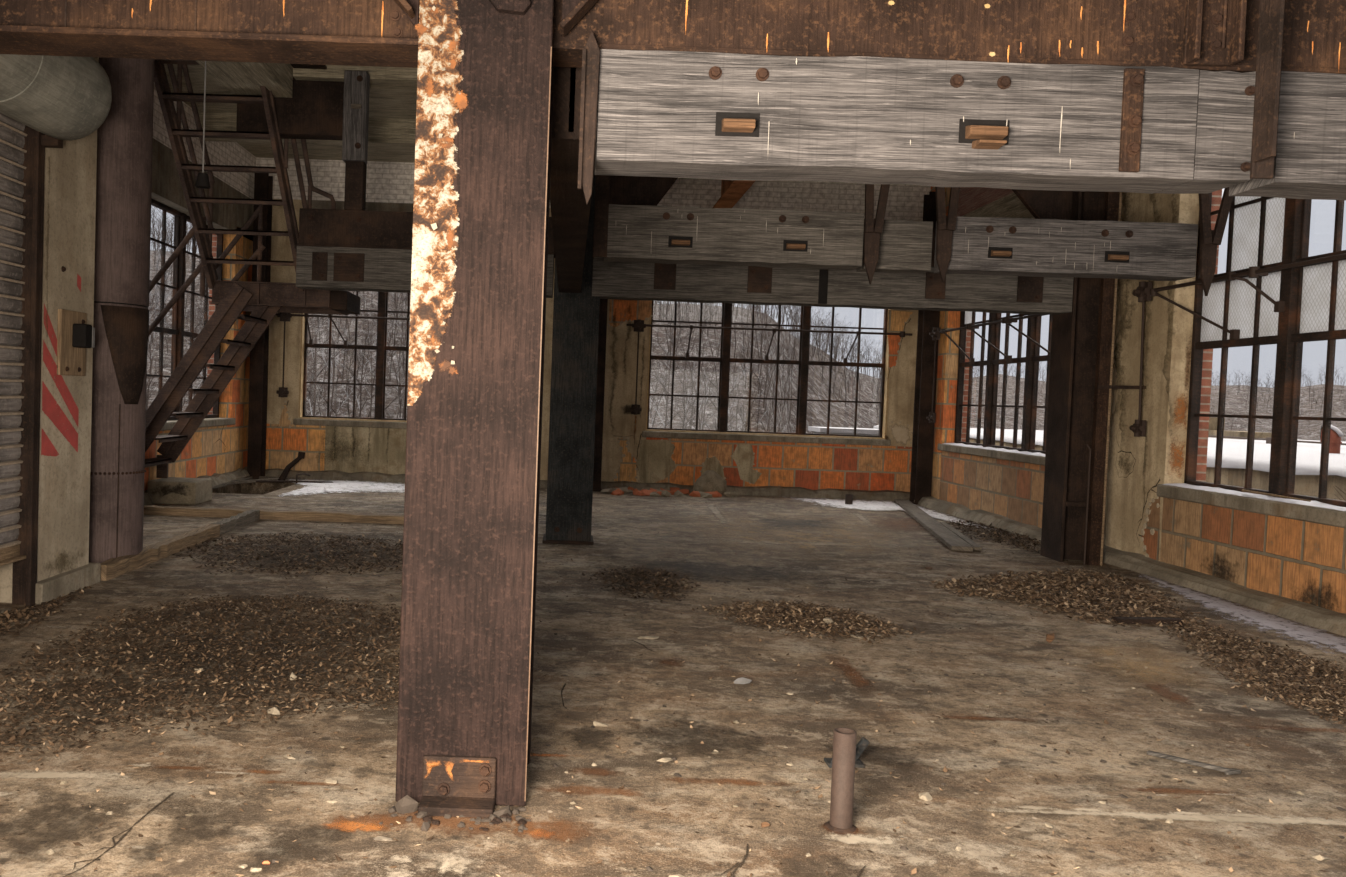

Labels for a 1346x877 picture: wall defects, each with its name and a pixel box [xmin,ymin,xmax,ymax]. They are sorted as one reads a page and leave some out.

peeling [407,0,468,406]